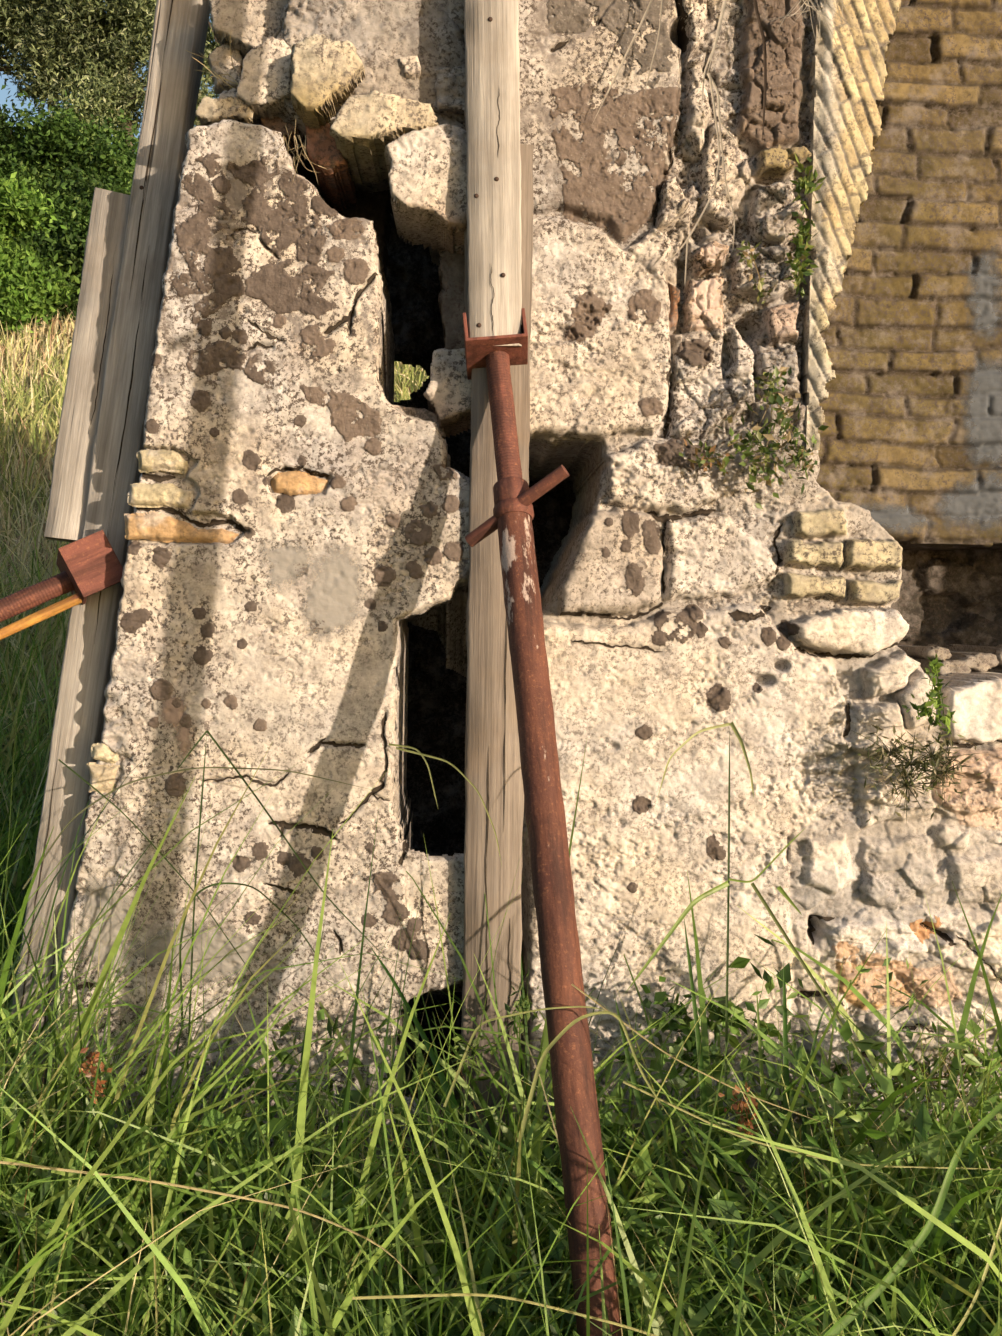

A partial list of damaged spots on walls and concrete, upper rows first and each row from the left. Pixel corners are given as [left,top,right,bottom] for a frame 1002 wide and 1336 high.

crack [675,0,689,52]
crack [324,272,379,336]
crack [204,713,390,840]